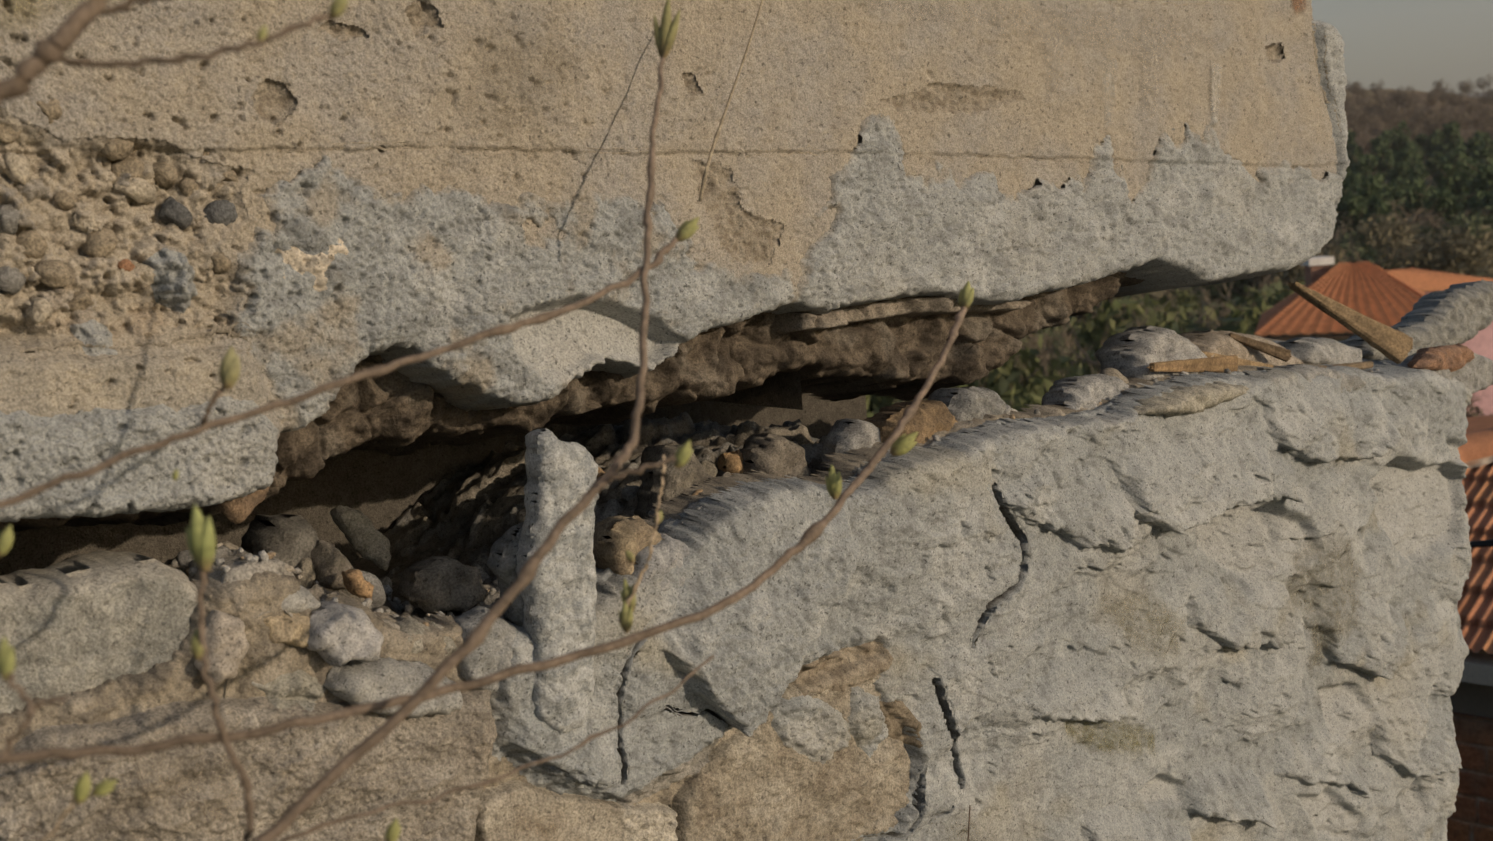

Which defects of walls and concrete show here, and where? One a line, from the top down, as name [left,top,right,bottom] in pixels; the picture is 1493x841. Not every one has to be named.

peeling [0,20,1350,524]
spalling [593,515,665,575]
crack [604,618,740,799]
crack [852,474,1031,841]